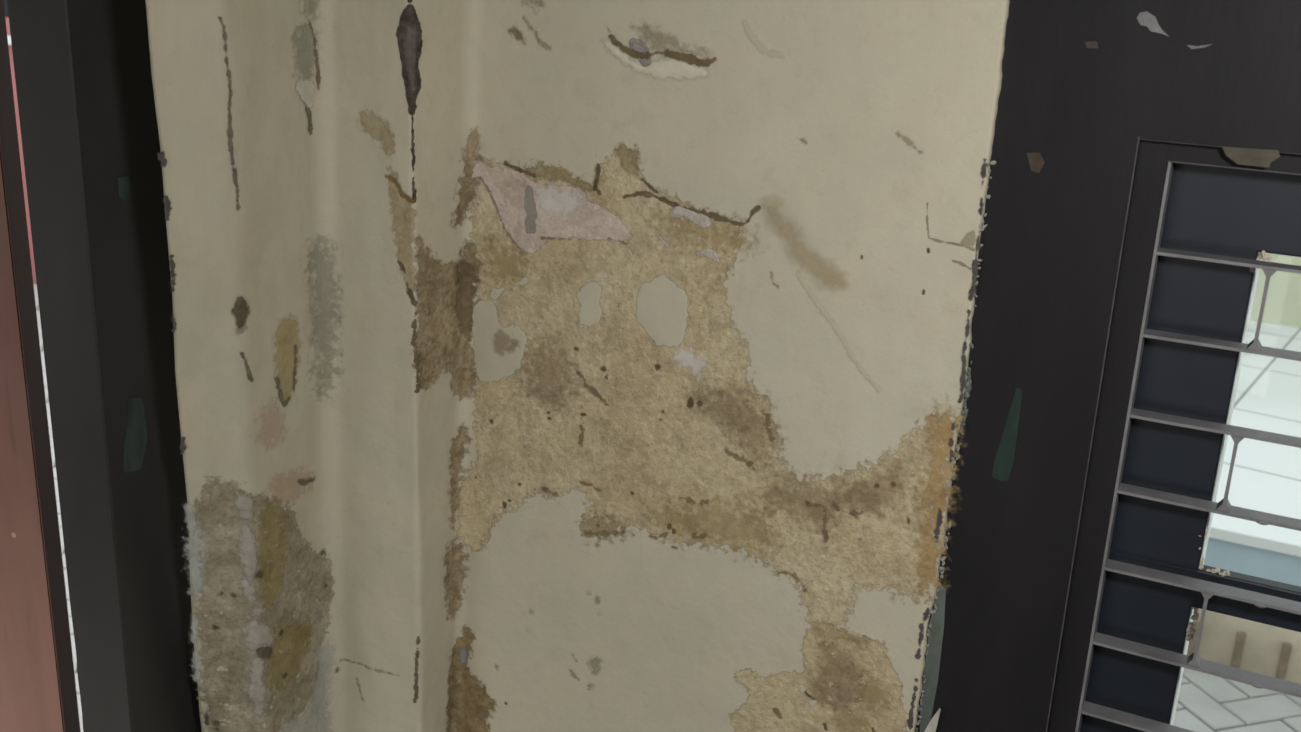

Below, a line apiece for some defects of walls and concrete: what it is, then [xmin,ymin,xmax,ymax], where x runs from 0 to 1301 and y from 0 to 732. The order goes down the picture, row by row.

spalling [396,4,423,115]
spalling [602,26,716,80]
spalling [163,195,172,221]
spalling [926,203,975,270]
peeling [455,144,958,732]
peeling [185,477,338,732]